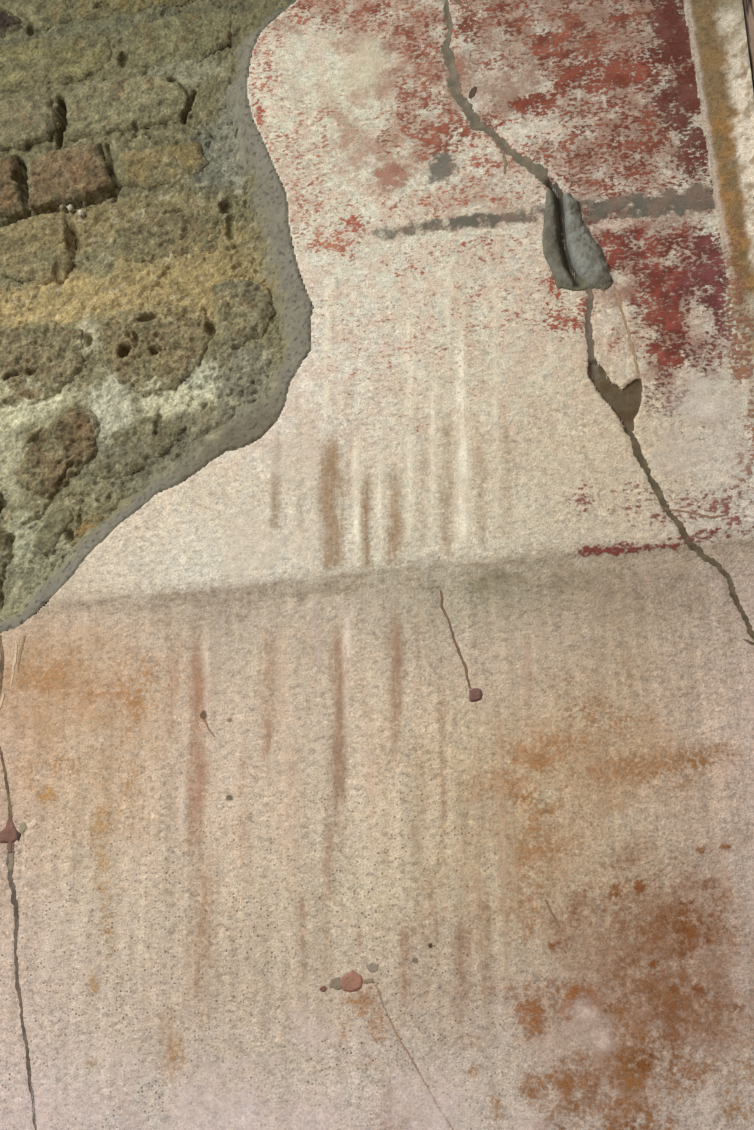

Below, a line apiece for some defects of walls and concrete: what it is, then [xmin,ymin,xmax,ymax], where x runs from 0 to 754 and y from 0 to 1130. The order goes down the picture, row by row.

crack [441,0,553,188]
leakage [296,441,414,562]
flaking render [0,0,754,634]
leakage [446,279,469,542]
crack [584,286,639,380]
crack [623,427,754,645]
crack [0,635,25,708]
leakage [333,618,351,799]
crack [439,589,471,689]
crack [0,747,36,1130]
rust [516,987,543,1034]
rust [522,904,740,1130]